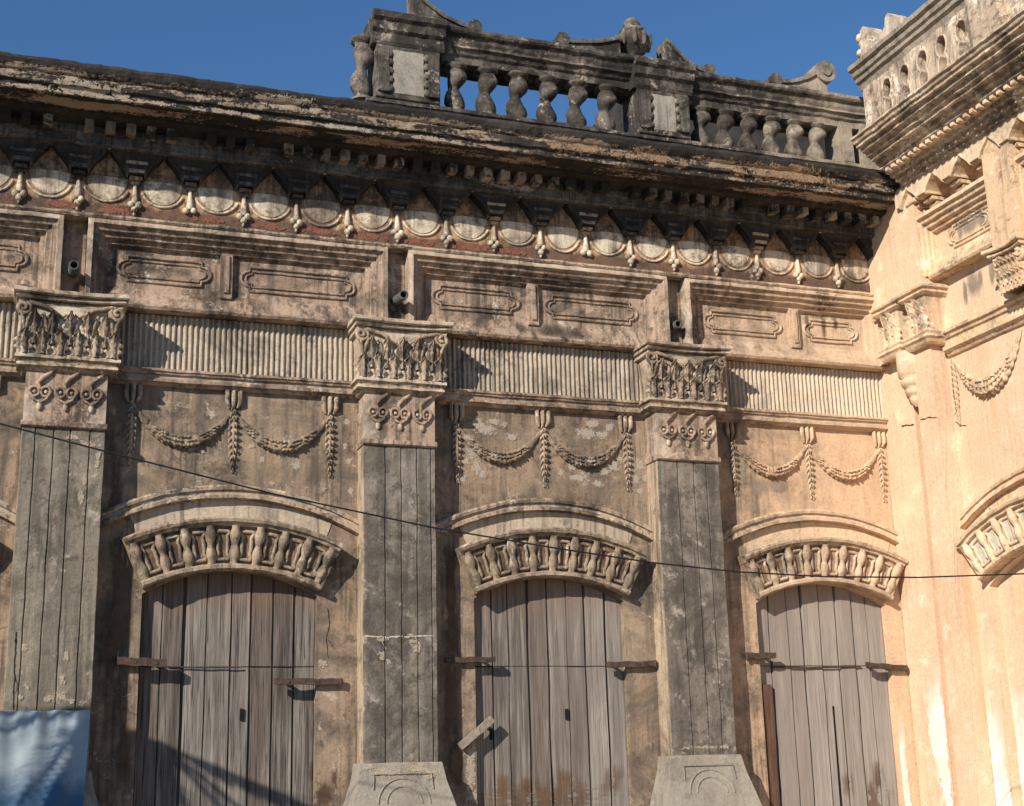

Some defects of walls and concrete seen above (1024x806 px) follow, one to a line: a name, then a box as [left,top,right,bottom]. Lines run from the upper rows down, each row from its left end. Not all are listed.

peeling [7,76,373,134]
peeling [412,135,457,144]
peeling [546,140,691,169]
peeling [719,160,855,193]